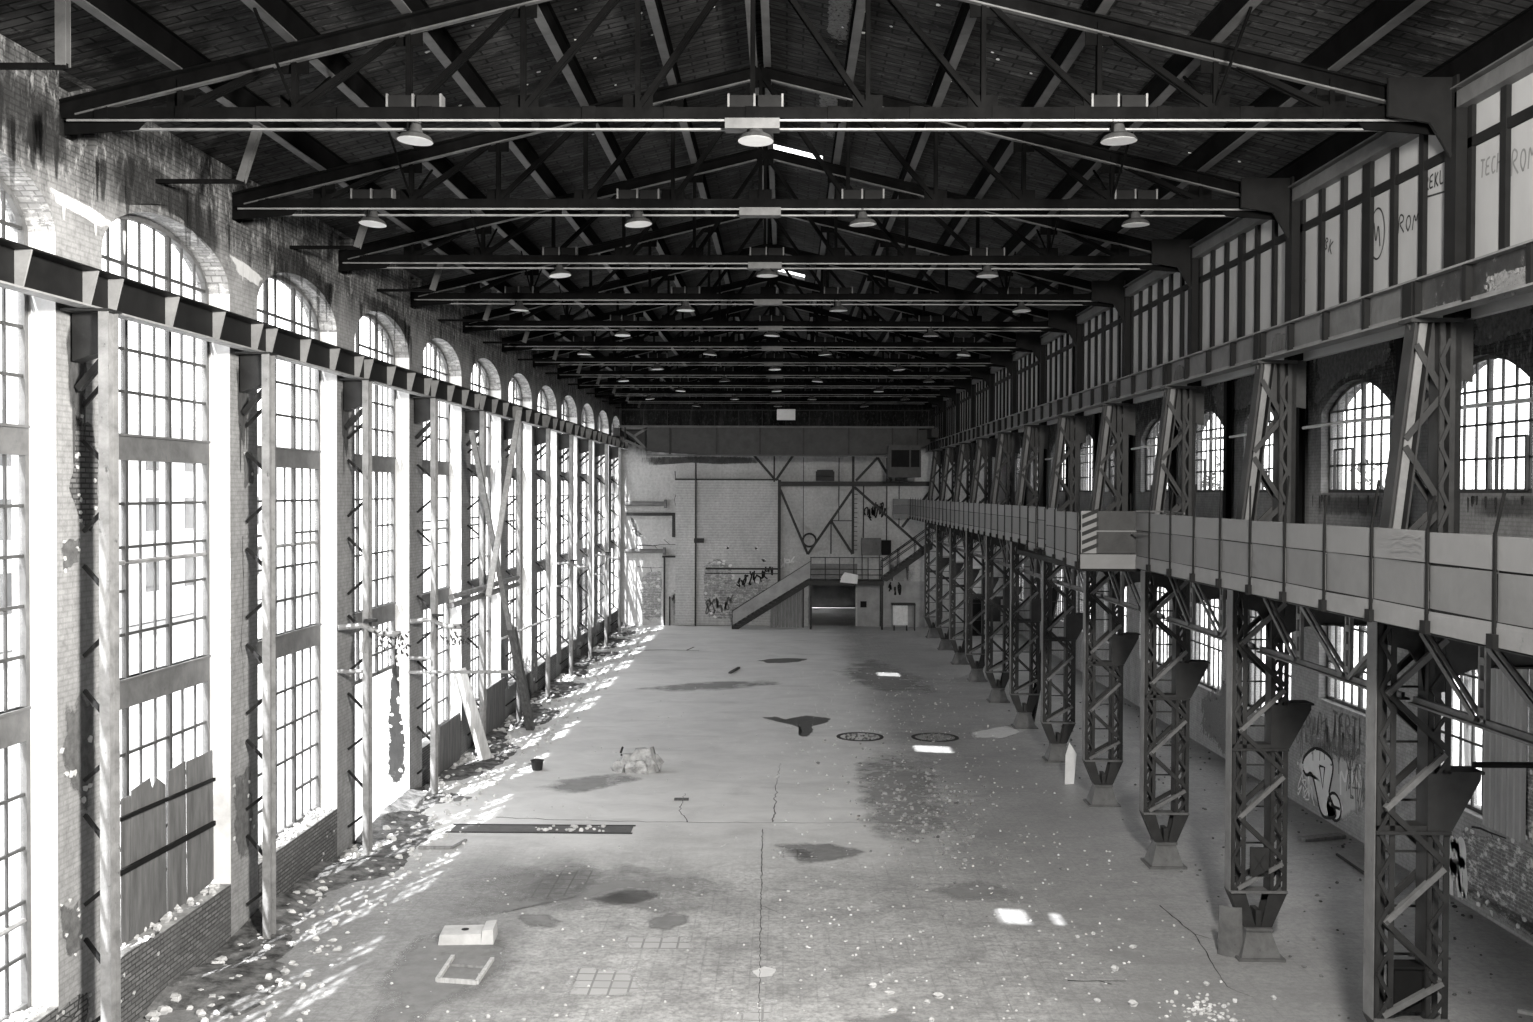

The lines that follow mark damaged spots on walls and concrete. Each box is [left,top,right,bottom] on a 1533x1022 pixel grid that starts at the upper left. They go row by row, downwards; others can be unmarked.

damp [0,70,333,324]
spalling [1451,768,1533,933]